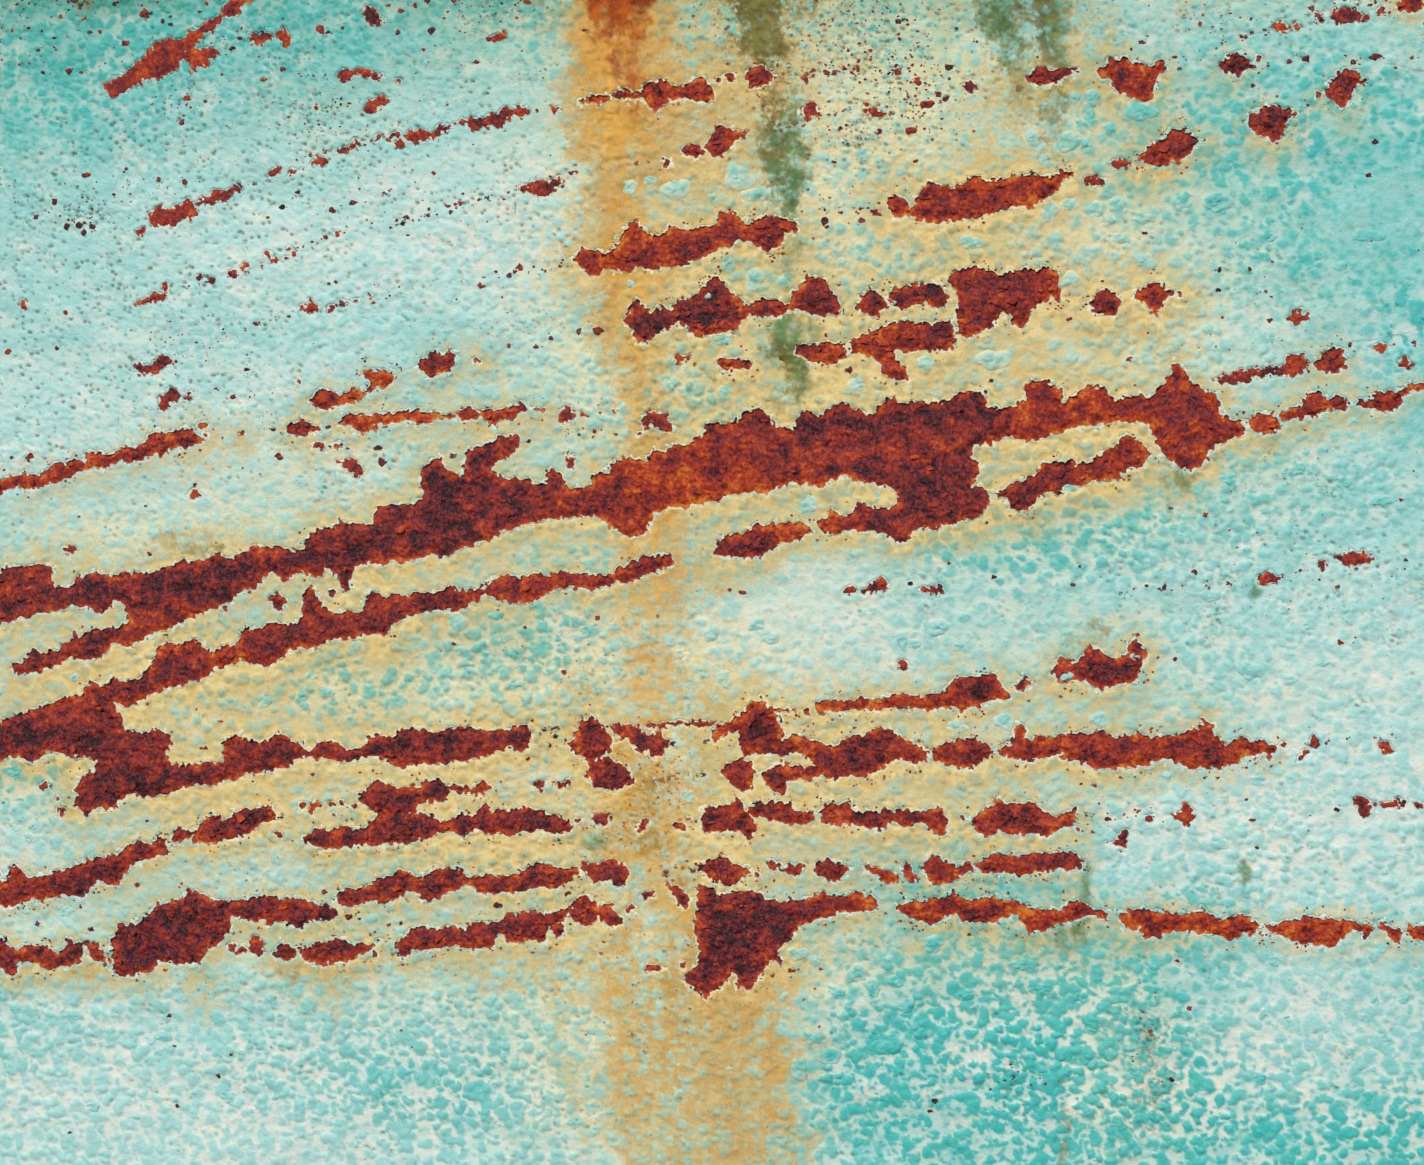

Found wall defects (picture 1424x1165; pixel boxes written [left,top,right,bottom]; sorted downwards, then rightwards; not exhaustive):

damp [728,0,788,66]
damp [761,122,797,187]
damp [766,315,812,393]
corrosion [1372,341,1415,371]
corrosion [0,335,1401,1165]
corrosion [1352,794,1424,821]